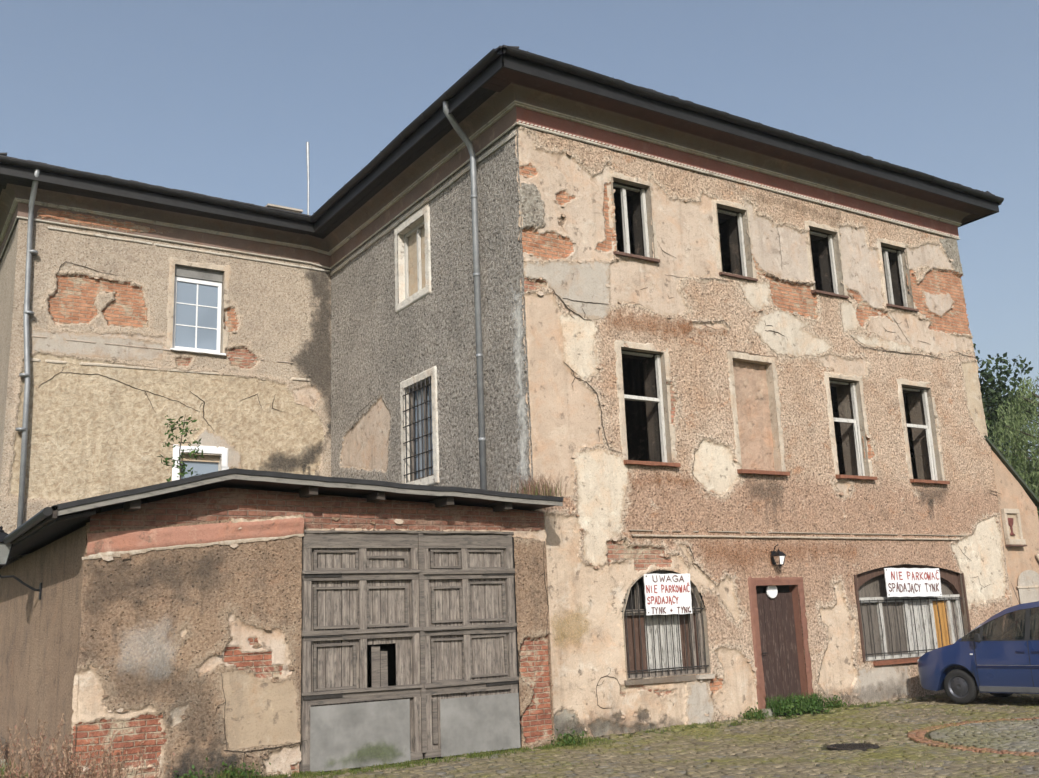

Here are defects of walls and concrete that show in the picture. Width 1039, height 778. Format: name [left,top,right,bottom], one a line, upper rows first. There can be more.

crack [42,370,213,429]
peeling [8,346,325,501]
leakage [291,268,331,428]
crack [564,362,621,453]
peeling [515,128,728,330]
crack [689,311,785,356]
peeling [744,200,818,320]
peeling [839,225,977,361]
crack [853,315,976,360]
peeling [951,516,1006,607]
peeling [82,510,758,744]
leakage [172,749,248,778]